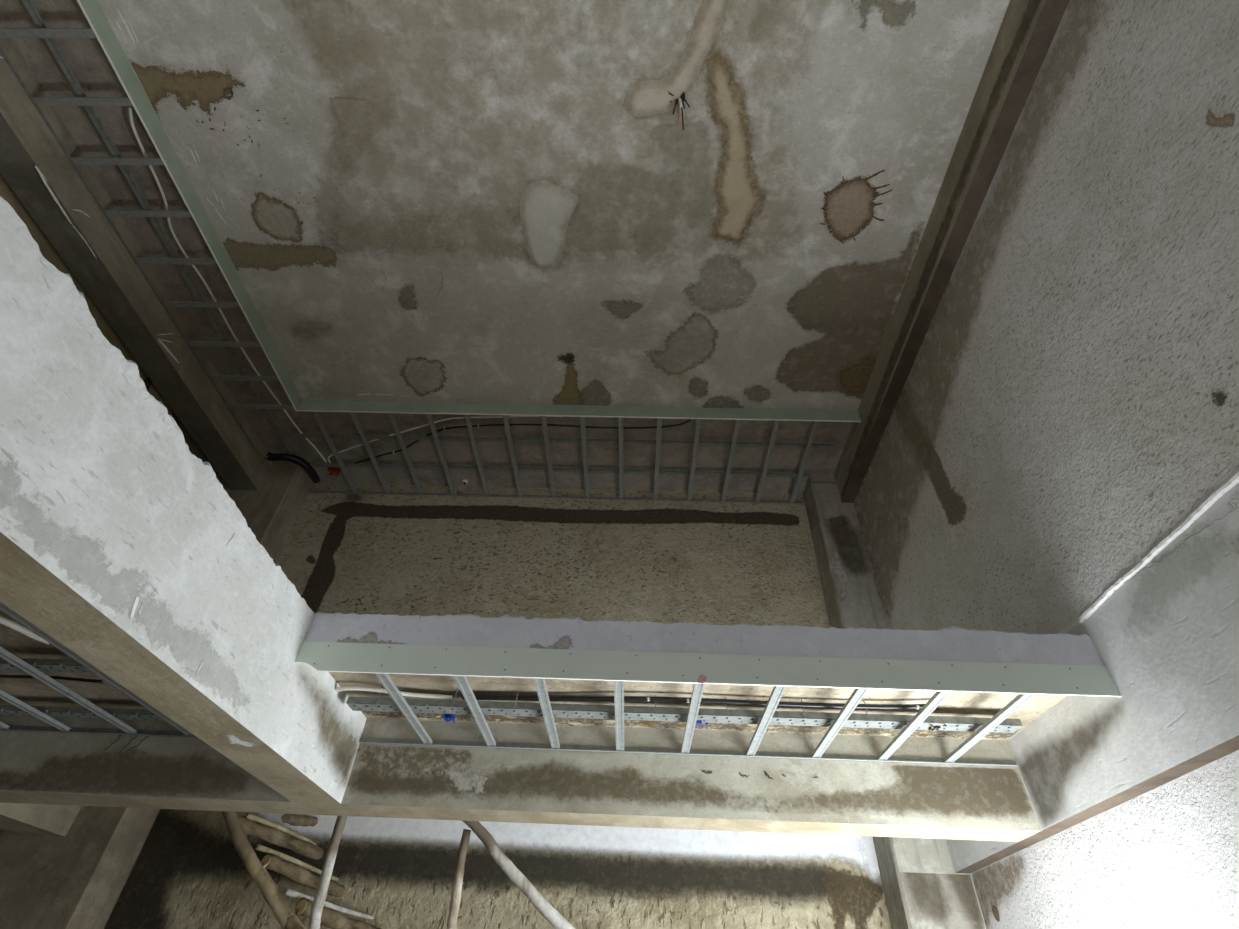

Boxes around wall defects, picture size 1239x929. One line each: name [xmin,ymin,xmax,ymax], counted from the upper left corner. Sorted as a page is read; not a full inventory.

leakage [644,0,1097,615]
spalling [0,196,708,649]
leakage [0,749,883,929]
leakage [312,690,741,806]
leakage [755,715,1112,823]